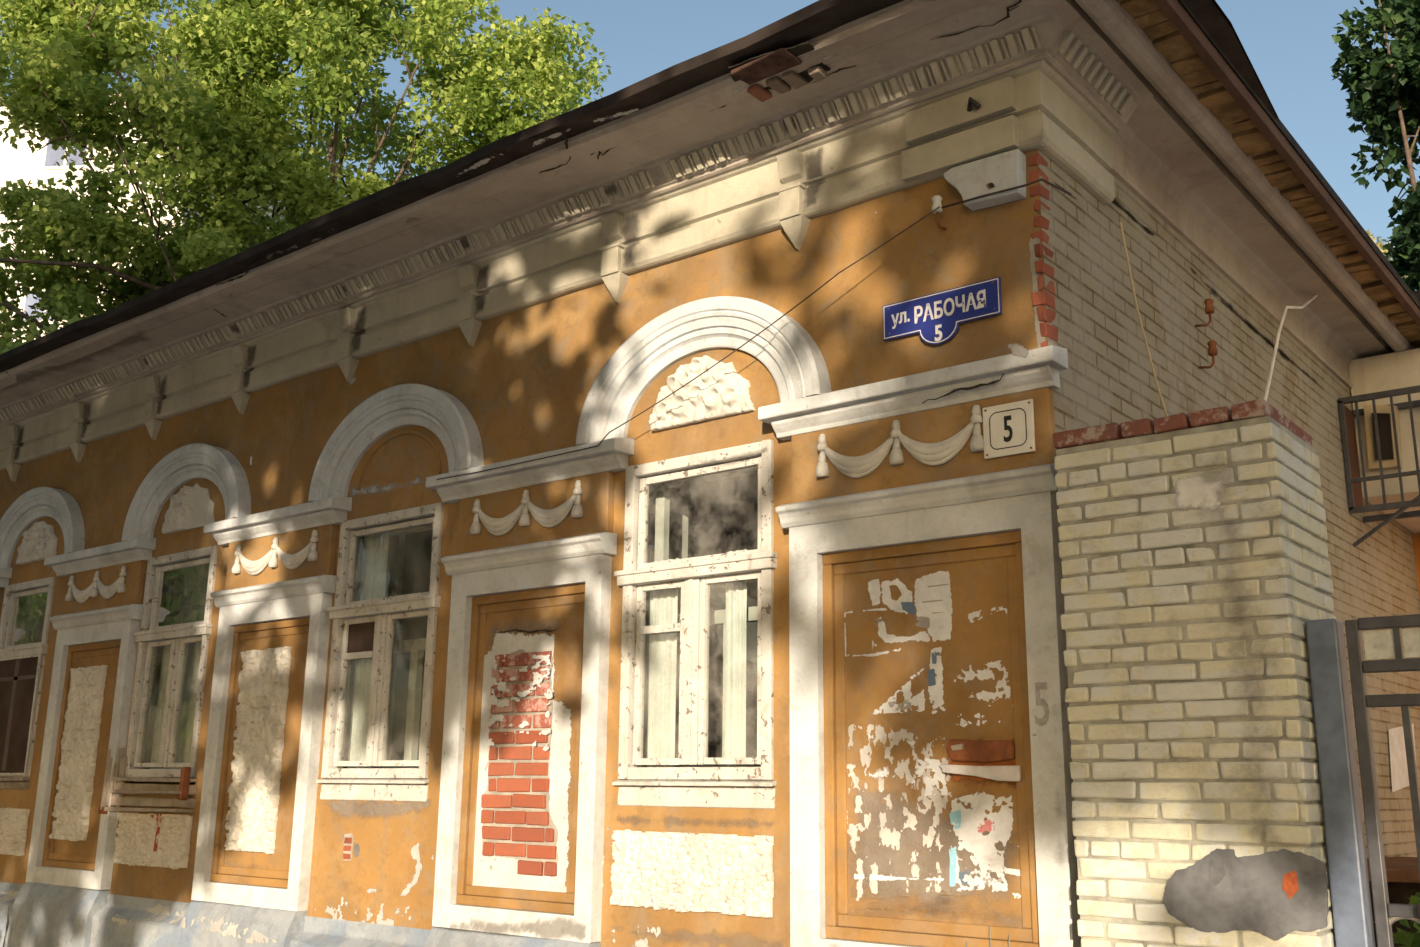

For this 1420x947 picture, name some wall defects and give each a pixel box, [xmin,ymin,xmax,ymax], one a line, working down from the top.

crack [929,0,1022,41]
spalling [728,42,838,102]
leakage [805,149,823,206]
leakage [623,214,638,265]
leakage [476,267,489,312]
crack [922,373,1005,404]
spalling [472,632,572,893]